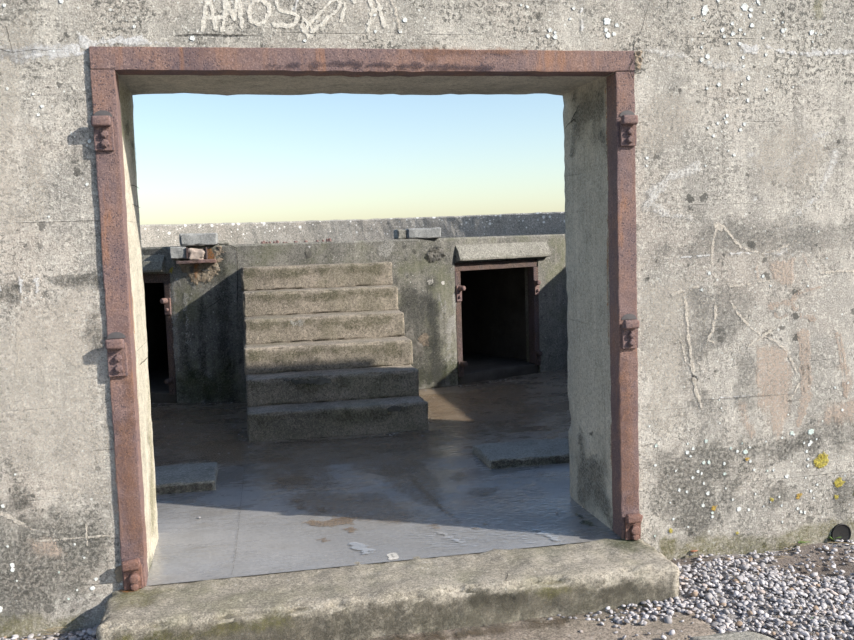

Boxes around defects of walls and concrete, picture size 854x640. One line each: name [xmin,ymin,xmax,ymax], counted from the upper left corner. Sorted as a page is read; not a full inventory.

rust [268,48,494,72]
leakage [151,255,538,532]
leakage [491,456,569,469]
leakage [654,445,741,536]
leakage [771,433,813,460]
leakage [0,487,107,630]